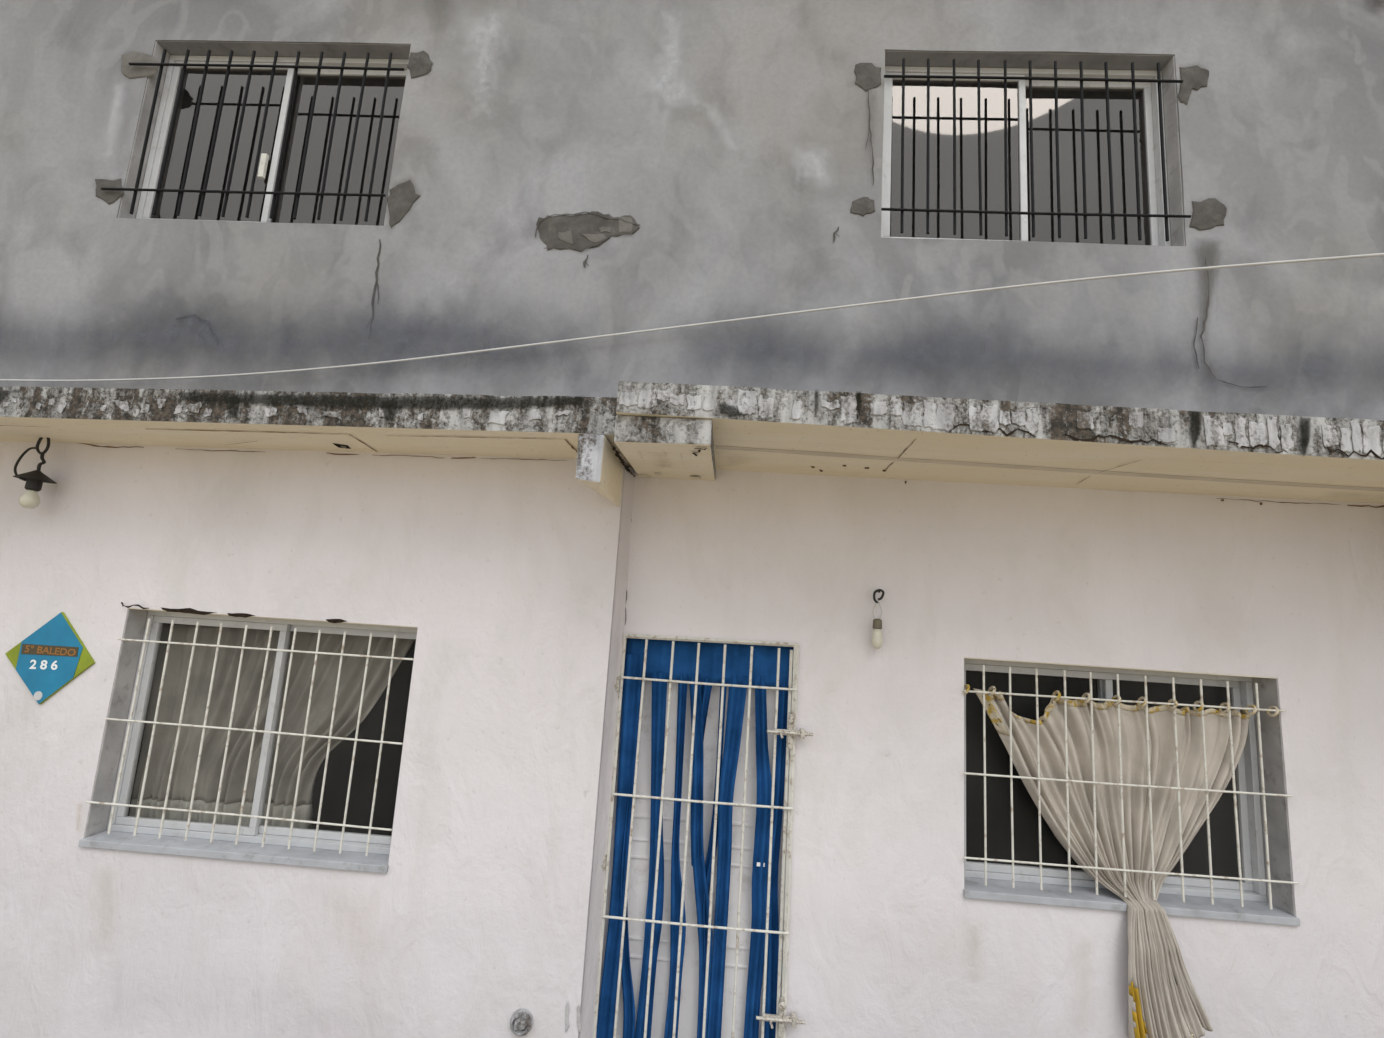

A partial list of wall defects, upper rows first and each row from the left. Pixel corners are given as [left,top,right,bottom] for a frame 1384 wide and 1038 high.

flaking render [535,211,640,252]
crack [371,239,381,319]
leakage [1201,243,1216,305]
leakage [91,312,537,366]
crack [1193,295,1267,388]
leakage [181,392,584,420]
leakage [719,403,741,416]
leakage [1191,412,1201,446]
crack [1229,441,1283,453]
leakage [1301,418,1311,454]
crack [1327,447,1384,460]
crack [1216,498,1384,508]